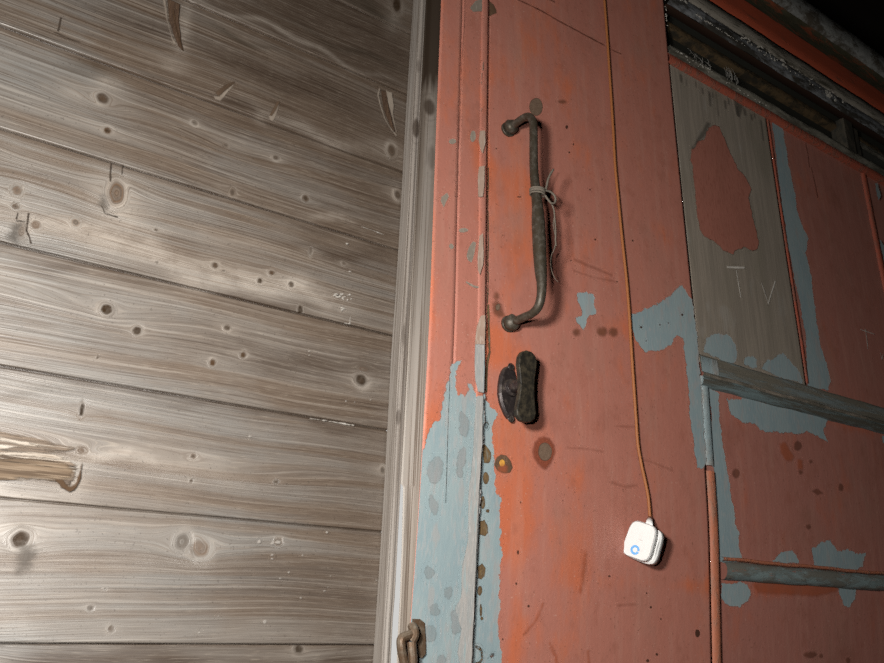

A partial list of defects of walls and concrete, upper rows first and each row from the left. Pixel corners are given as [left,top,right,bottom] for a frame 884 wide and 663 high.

peeling [467,233,484,274]
peeling [575,292,596,330]
peeling [631,123,831,563]
peeling [411,315,503,663]
peeling [811,540,866,570]
peeling [721,581,751,608]
peeling [838,588,856,607]